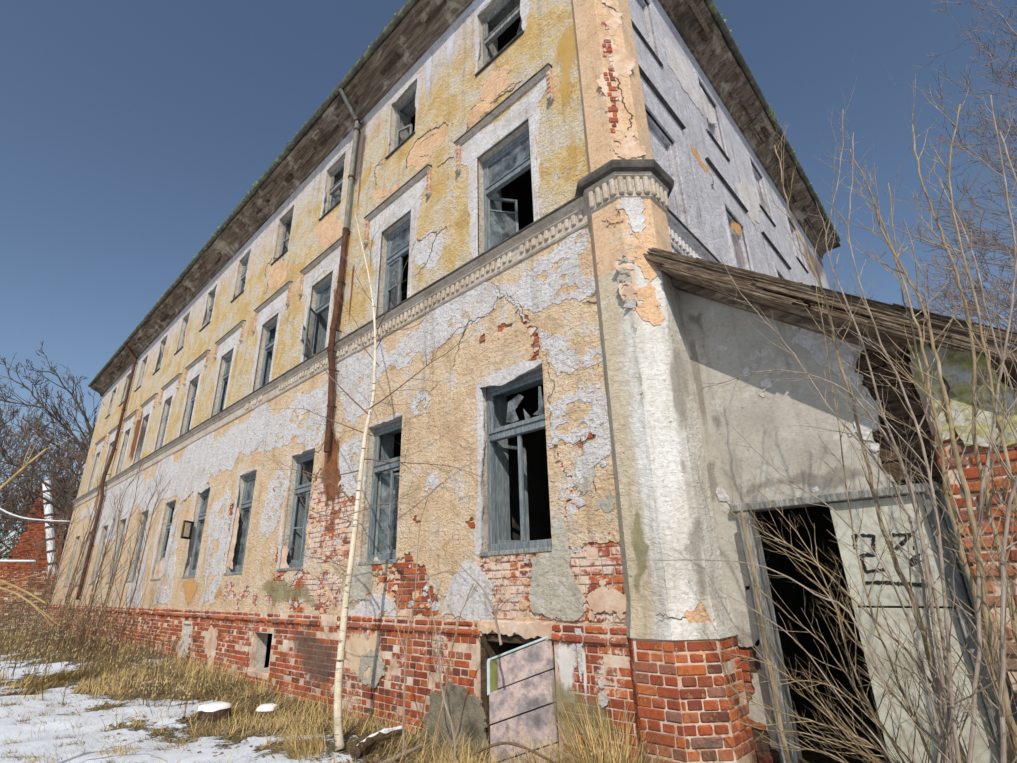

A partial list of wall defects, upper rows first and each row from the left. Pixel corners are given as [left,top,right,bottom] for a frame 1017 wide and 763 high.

flaking render [480,64,513,104]
flaking render [596,0,647,159]
crack [616,78,635,137]
corrosion [334,267,354,329]
flaking render [602,197,673,341]
corrosion [320,430,340,531]
peeling [80,229,626,626]
flaking render [791,325,882,452]